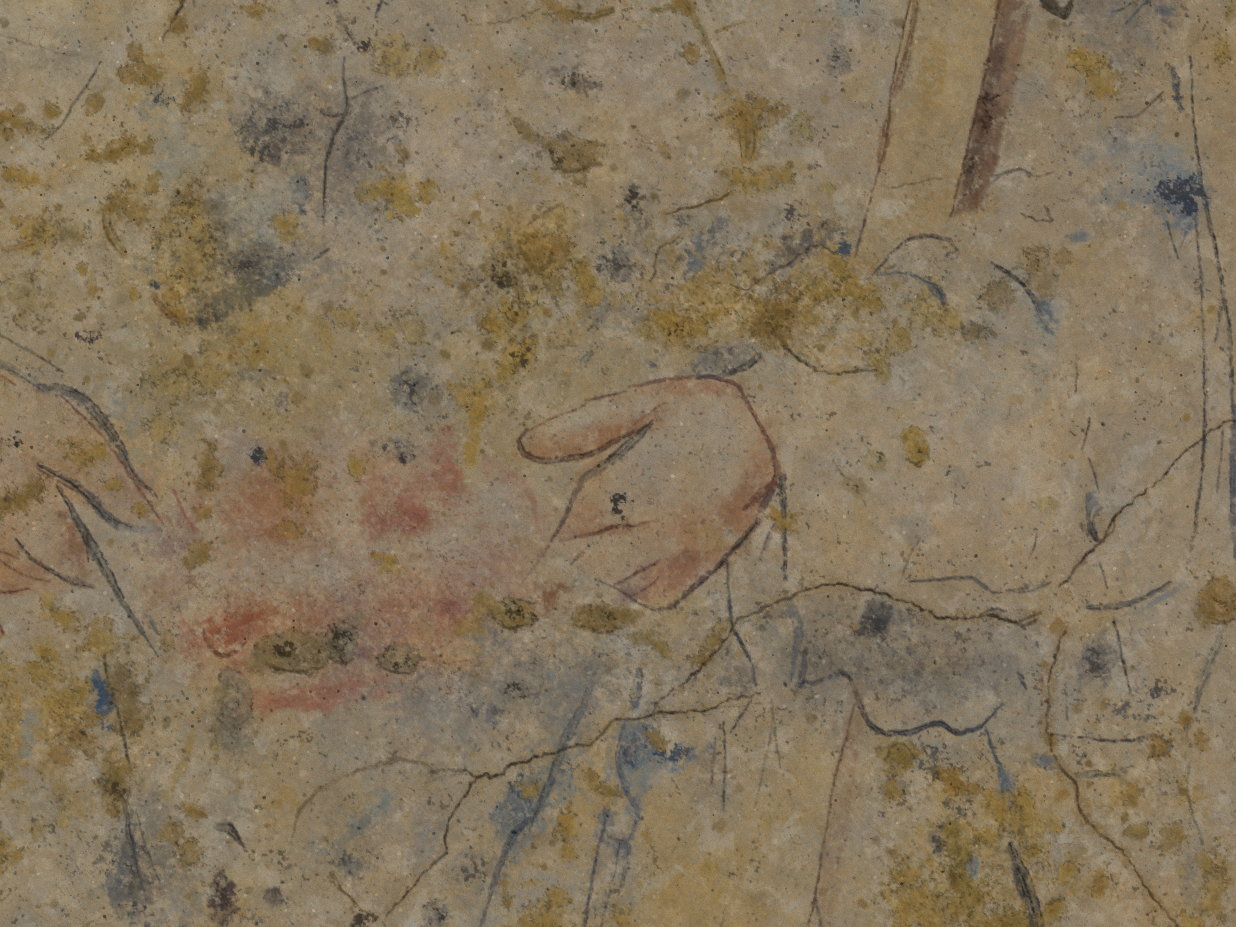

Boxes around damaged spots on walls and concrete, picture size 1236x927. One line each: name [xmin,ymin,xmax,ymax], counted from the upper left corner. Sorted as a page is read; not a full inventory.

crack [158,0,188,48]
crack [289,416,1236,927]